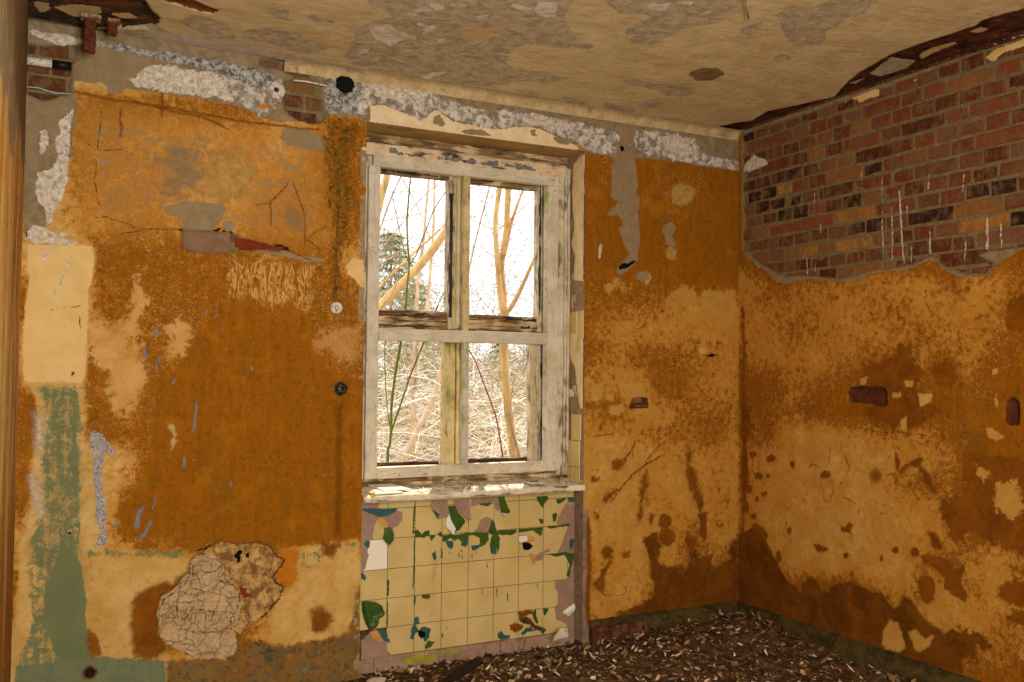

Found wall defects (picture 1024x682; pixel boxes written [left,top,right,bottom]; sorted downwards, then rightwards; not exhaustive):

crack [78,111,180,241]
flaking render [25,0,327,246]
flaking render [165,200,317,314]
crack [256,129,340,297]
flaking render [345,0,1024,298]
peeling [665,283,736,328]
flaking render [848,376,933,407]
flaking render [985,394,1020,442]
peeling [89,431,117,546]
water stain [584,306,1024,675]
peeling [361,496,575,660]